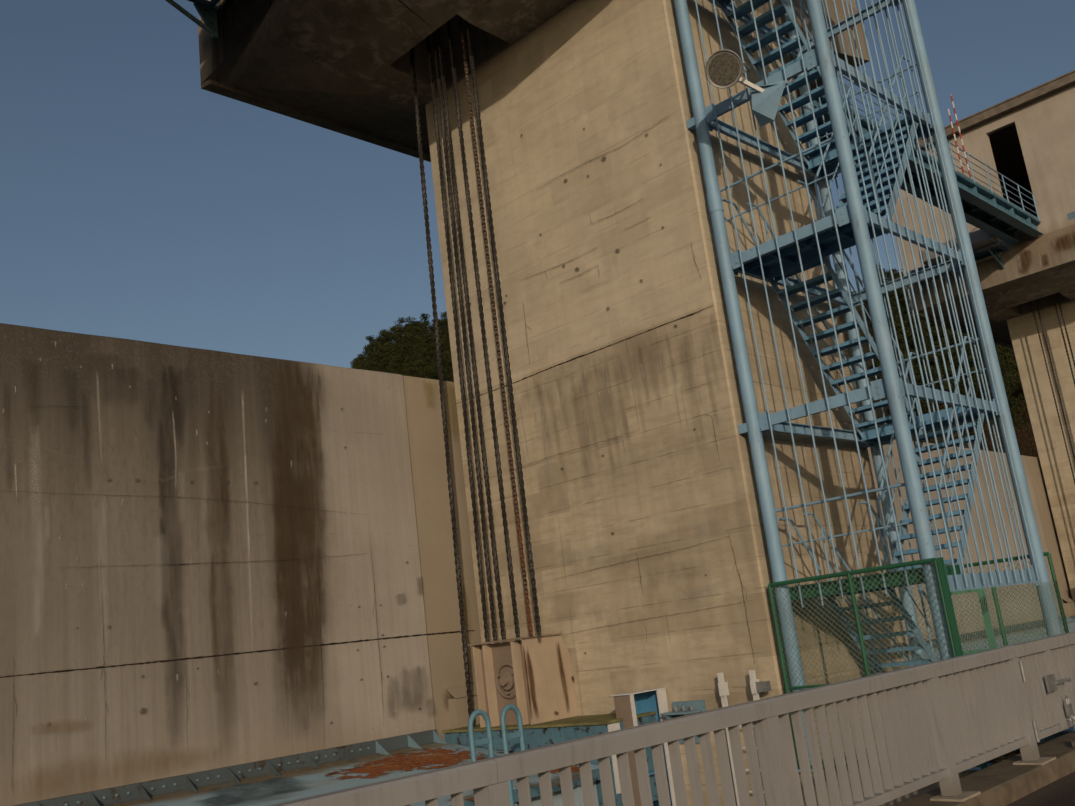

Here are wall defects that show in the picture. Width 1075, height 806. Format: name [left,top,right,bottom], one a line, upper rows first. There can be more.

water stain [274,362,324,670]
corrosion [102,748,514,806]
corrosion [530,764,580,786]